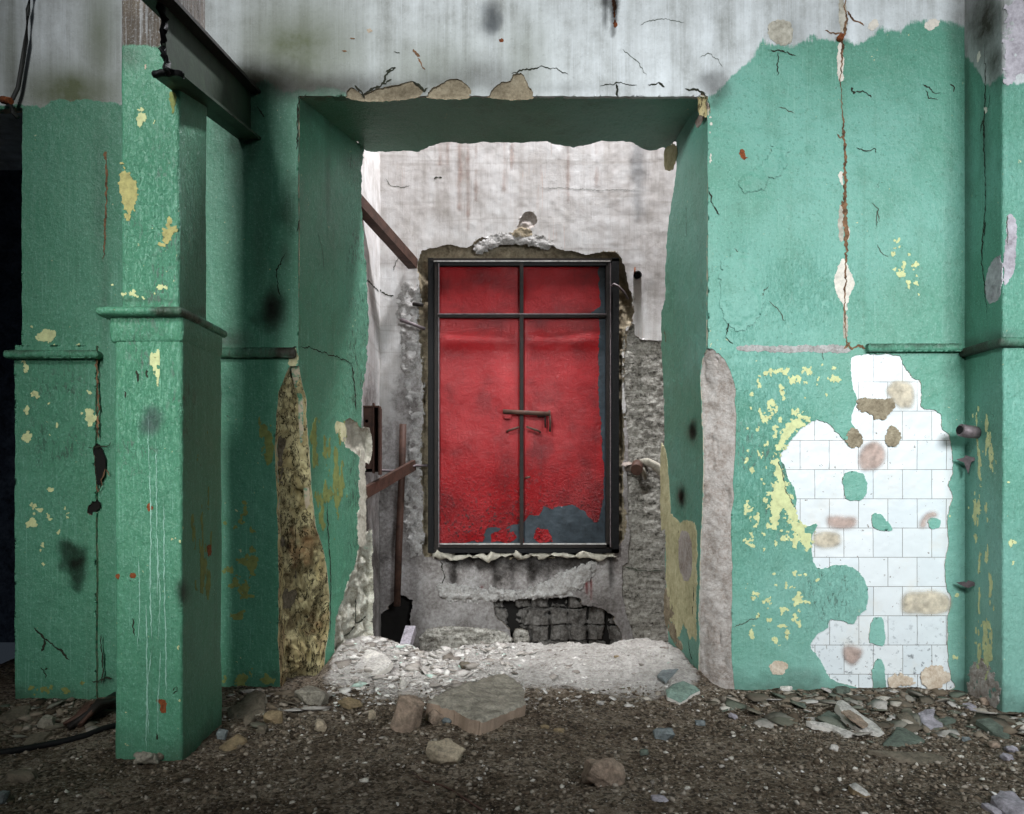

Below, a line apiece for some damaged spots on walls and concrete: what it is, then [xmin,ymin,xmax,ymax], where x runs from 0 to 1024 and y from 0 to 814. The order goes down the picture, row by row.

spalling [346,79,471,102]
spalling [488,74,534,101]
crack [601,51,705,96]
peeling [118,162,139,221]
crack [822,0,888,360]
crack [980,45,1008,313]
spalling [985,214,1017,304]
crack [293,346,356,407]
flaking render [395,211,1001,708]
peeling [179,486,259,620]
spalling [222,348,374,687]
crack [34,628,69,678]